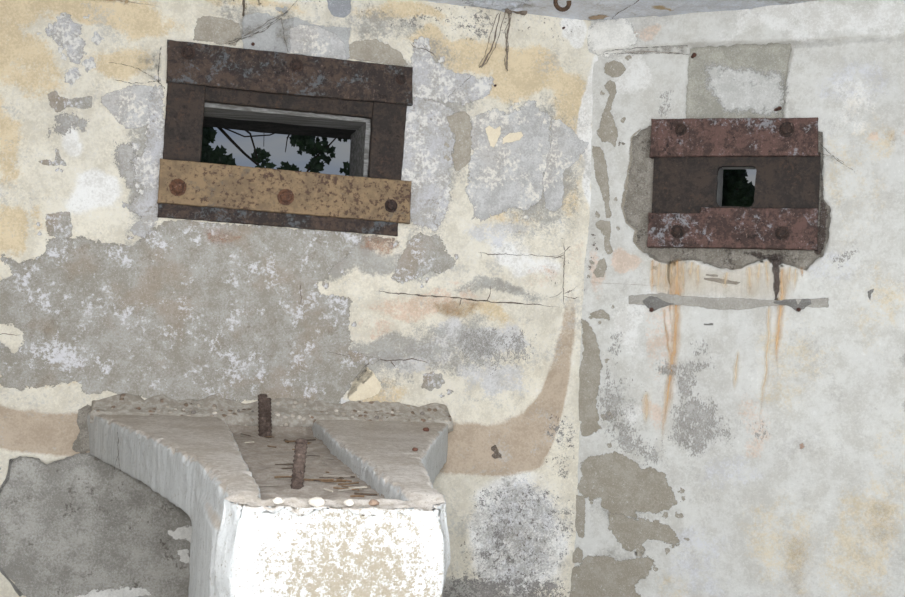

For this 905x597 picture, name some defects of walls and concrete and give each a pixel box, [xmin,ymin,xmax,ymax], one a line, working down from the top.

peeling [0,0,856,438]
crack [380,243,678,307]
spalling [0,404,192,597]
spalling [290,438,308,489]
leakage [547,420,575,478]
peeling [569,305,690,597]
peeling [656,339,731,457]